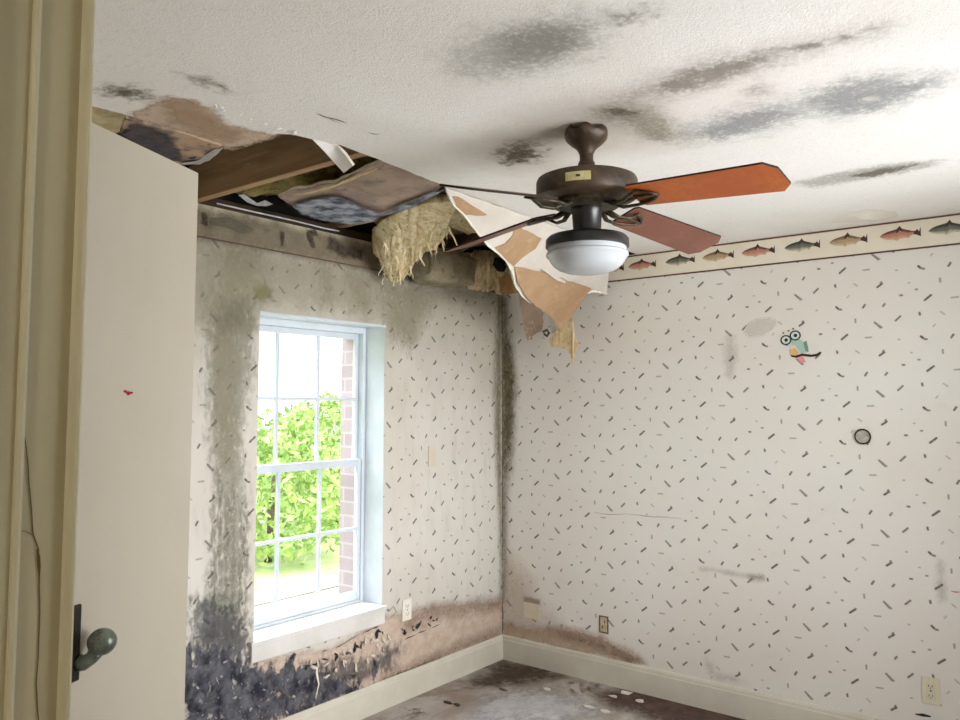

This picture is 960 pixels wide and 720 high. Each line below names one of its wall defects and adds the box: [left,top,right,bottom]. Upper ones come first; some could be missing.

peeling [133,98,297,149]
damp [500,145,533,162]
damp [859,166,910,177]
damp [197,190,442,270]
damp [496,296,513,561]
peeling [305,629,391,679]